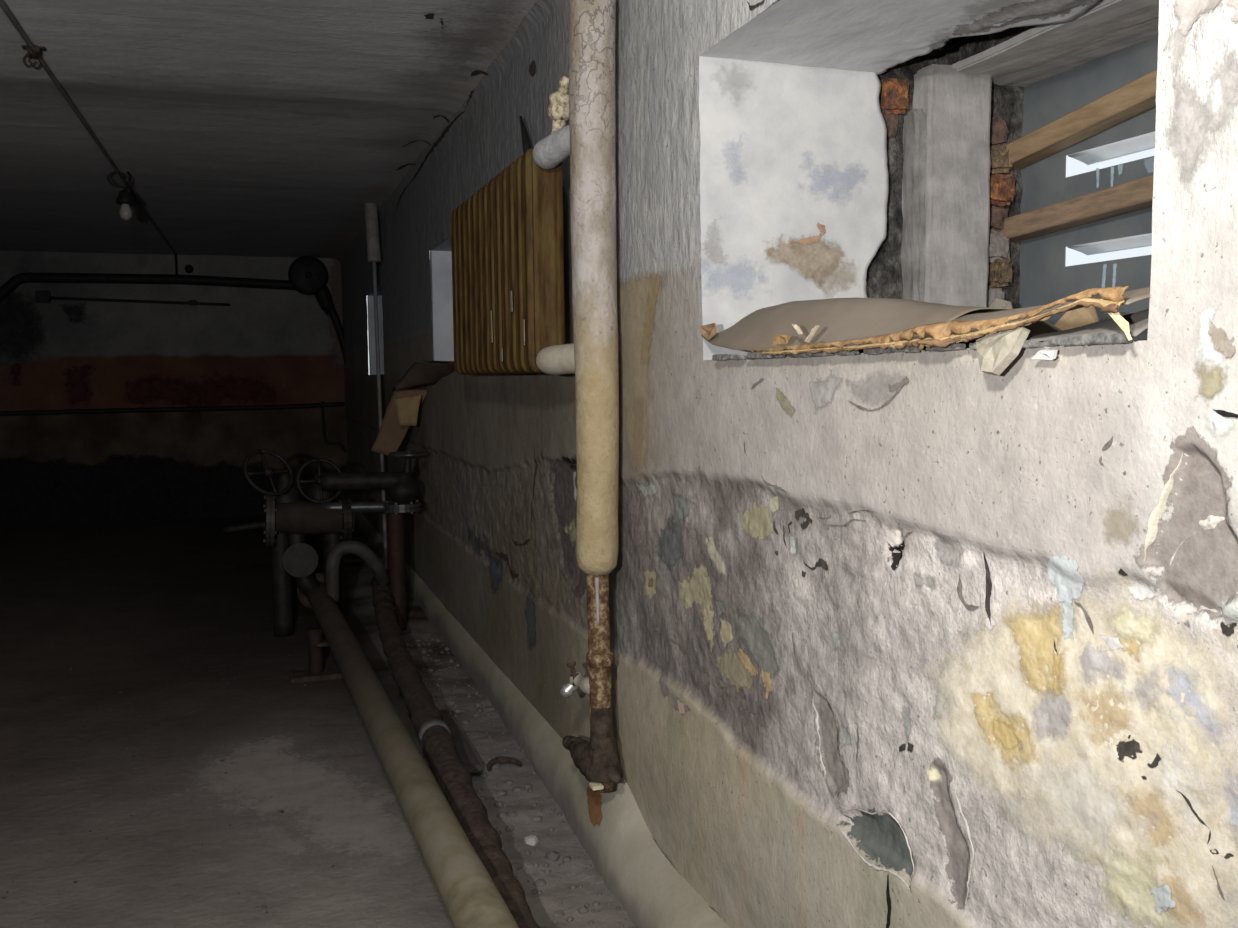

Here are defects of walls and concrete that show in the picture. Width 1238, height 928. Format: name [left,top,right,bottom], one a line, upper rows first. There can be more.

spalling [1173,0,1238,36]
spalling [549,455,587,597]
peeling [678,536,773,699]
peeling [739,495,828,577]
spalling [885,528,913,570]
spalling [914,574,935,590]
peeling [926,409,1238,928]
spalling [811,688,859,798]
rust [587,782,602,825]
spalling [833,807,914,890]